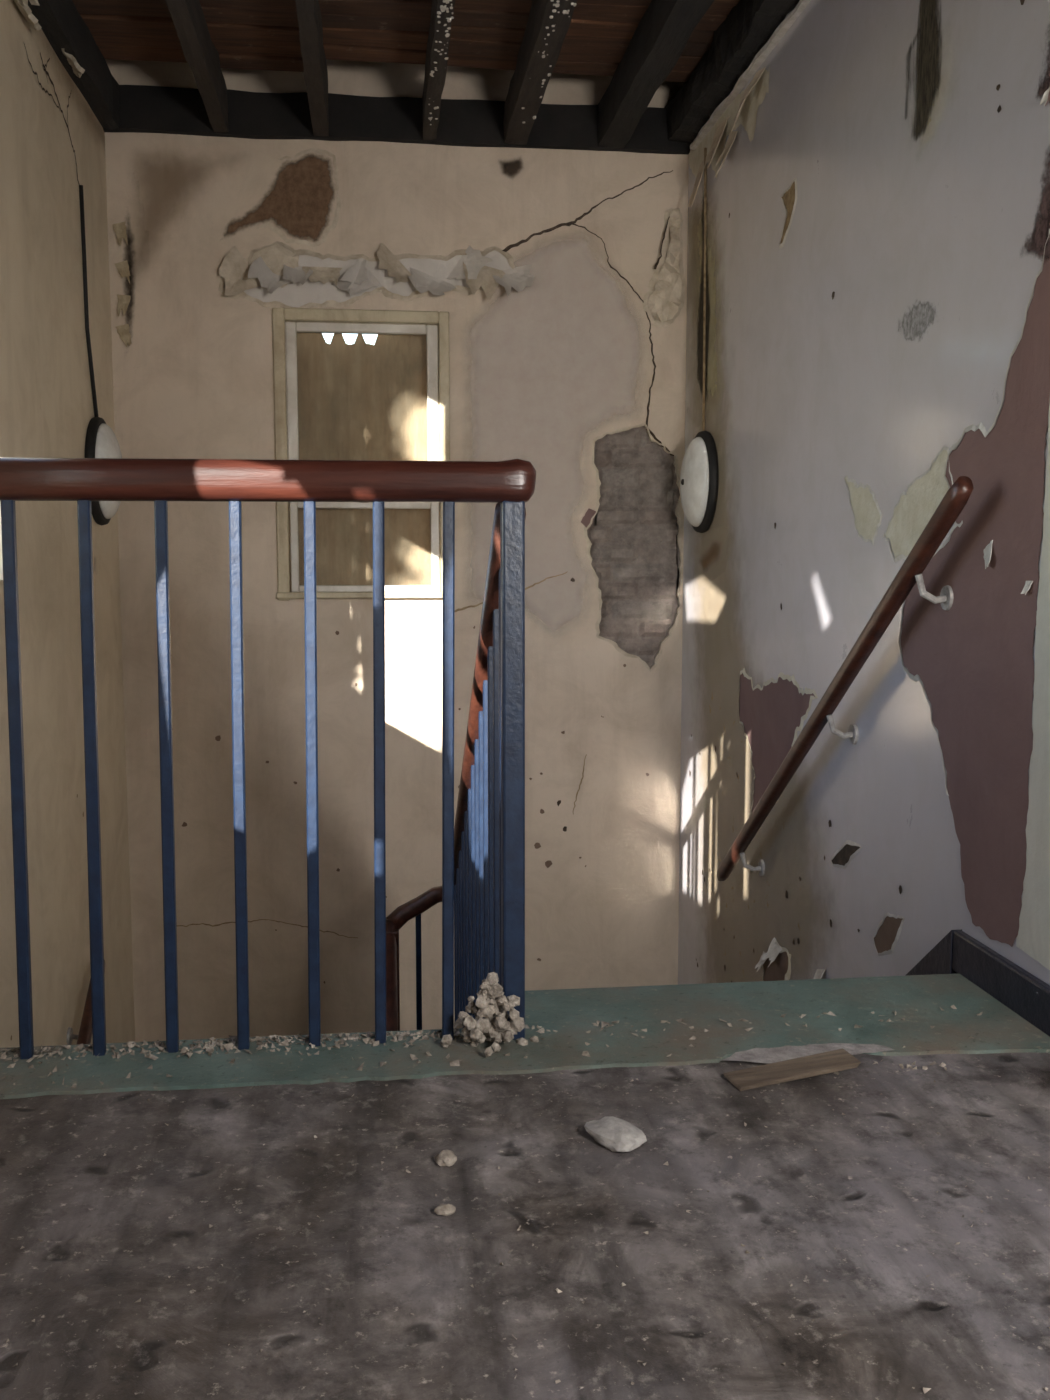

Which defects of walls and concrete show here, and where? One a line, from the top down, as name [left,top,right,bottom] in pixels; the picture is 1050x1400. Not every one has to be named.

crack [502,170,674,456]
peeling [883,229,1050,970]
peeling [736,668,818,812]
peeling [753,937,800,981]
peeling [857,912,905,956]